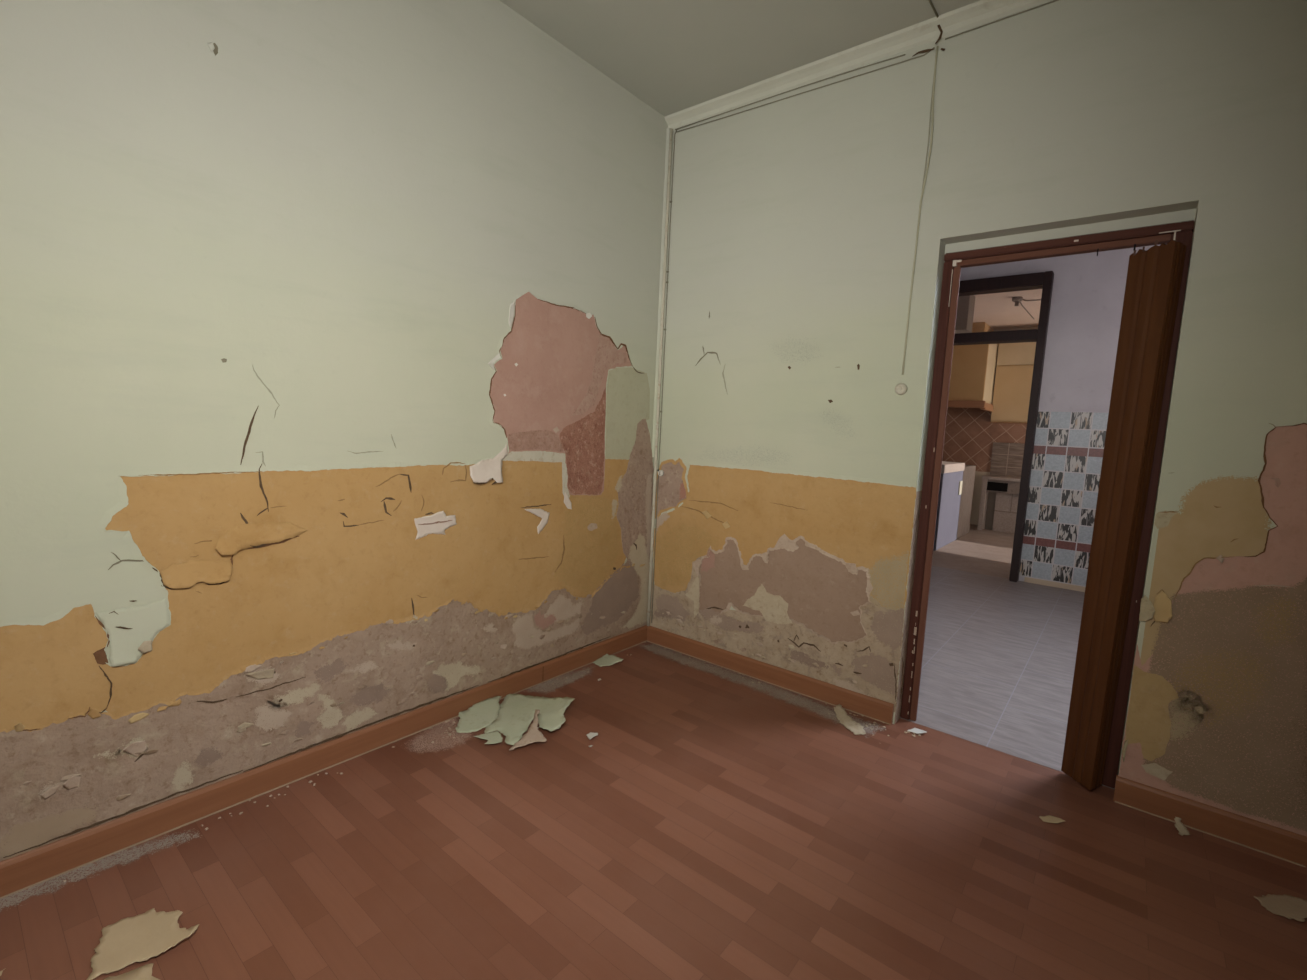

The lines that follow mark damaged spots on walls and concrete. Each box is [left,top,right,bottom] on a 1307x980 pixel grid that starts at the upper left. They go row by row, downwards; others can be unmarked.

crack [108,365,299,593]
crack [3,636,611,858]
peeling [0,288,927,861]
spalling [1118,423,1307,836]